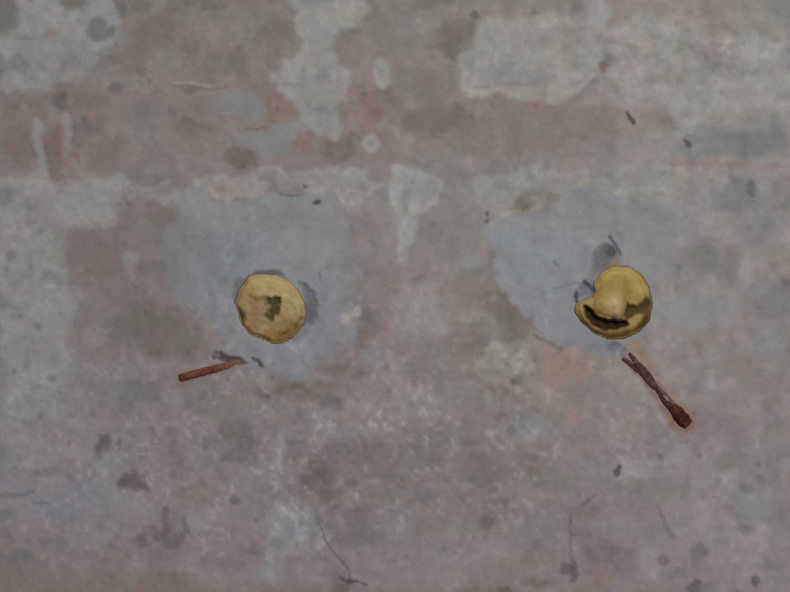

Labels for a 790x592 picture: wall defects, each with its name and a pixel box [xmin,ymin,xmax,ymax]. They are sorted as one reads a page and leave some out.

corrosion [173,355,248,387]
corrosion [617,337,701,437]